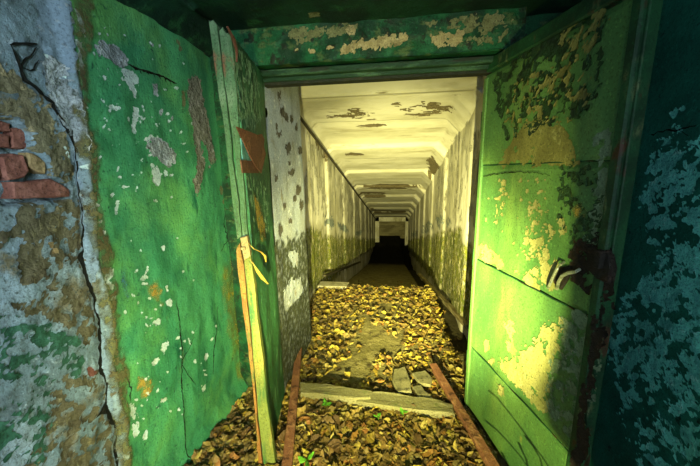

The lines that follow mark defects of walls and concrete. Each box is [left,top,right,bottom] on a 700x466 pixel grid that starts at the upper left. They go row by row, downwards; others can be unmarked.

crack [10,42,119,466]
peeling [0,0,130,466]
crack [128,64,177,84]
spalling [93,27,216,196]
peeling [283,250,304,311]
peeling [286,12,408,55]
peeling [275,91,421,237]
peeling [484,303,588,437]
peeling [492,8,612,291]
corrosion [568,232,600,295]
corrosion [569,277,615,466]
peeling [592,105,700,466]